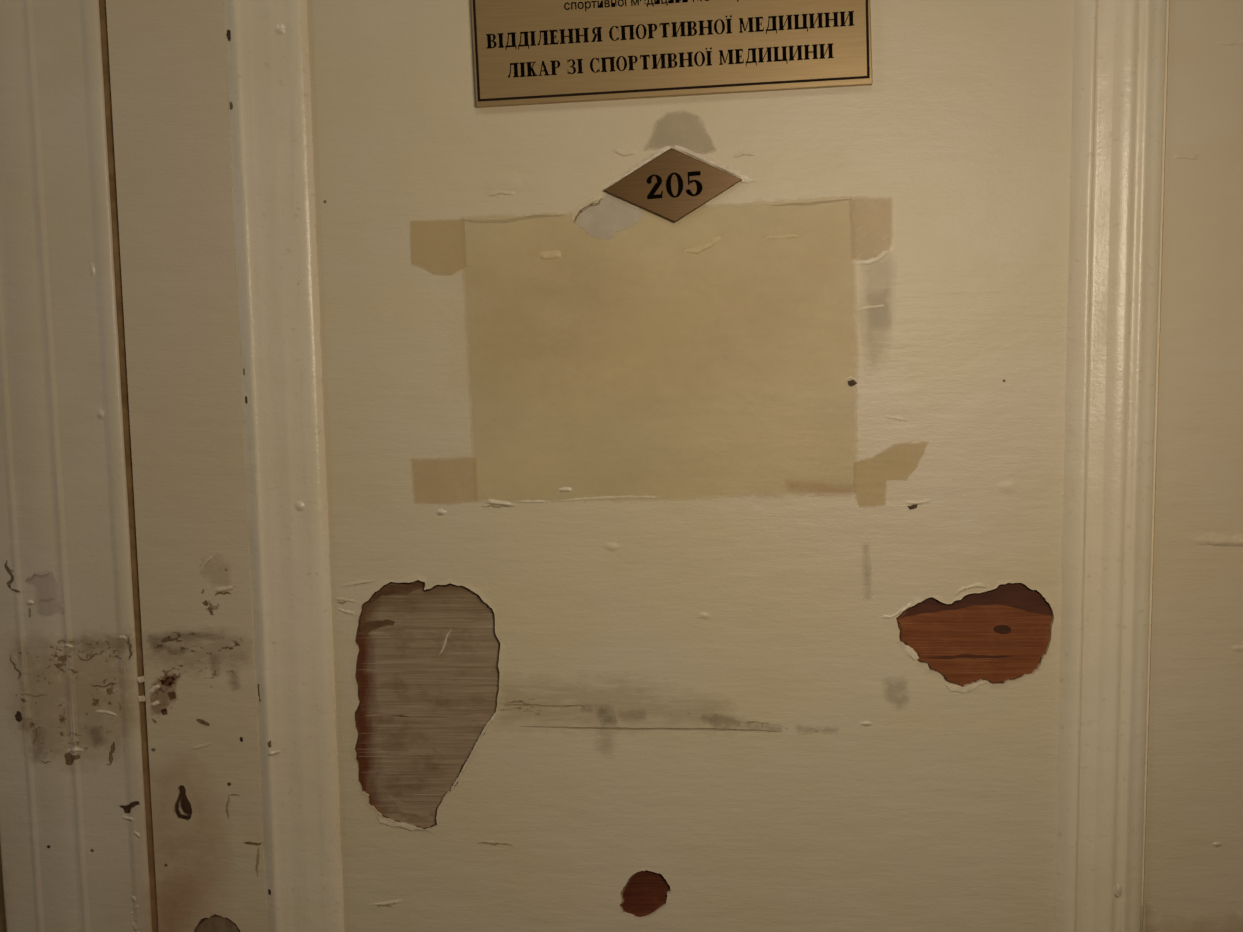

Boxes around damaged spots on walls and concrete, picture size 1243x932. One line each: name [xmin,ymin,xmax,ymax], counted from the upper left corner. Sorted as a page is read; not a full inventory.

peeling [571,114,759,239]
peeling [879,580,1056,693]
peeling [334,573,506,834]
peeling [617,866,675,921]